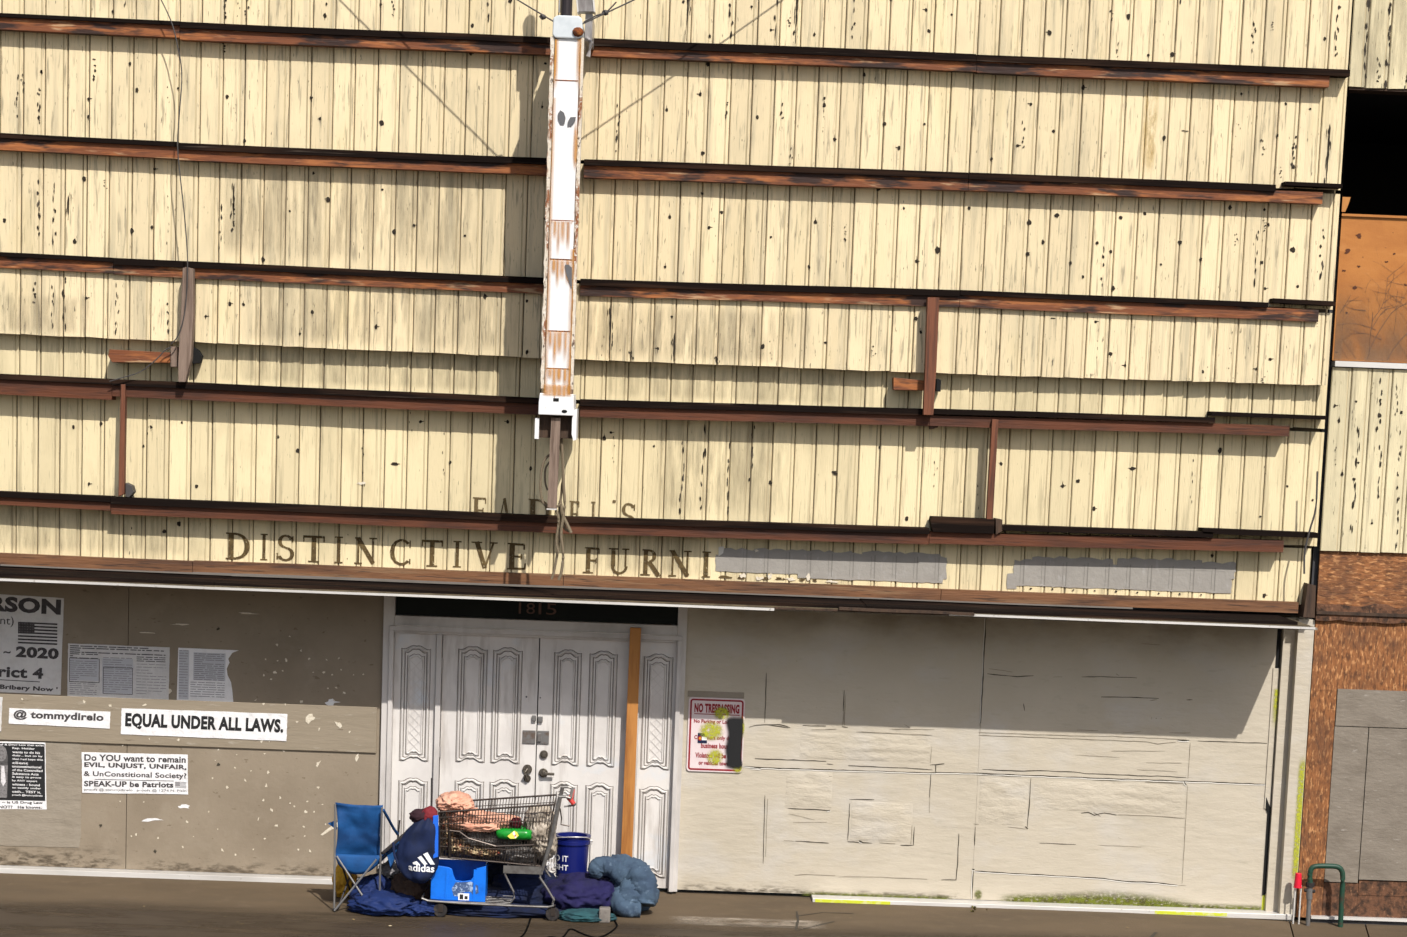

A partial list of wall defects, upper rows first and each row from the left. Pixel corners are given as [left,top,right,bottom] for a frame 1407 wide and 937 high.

corrosion [544,221,575,396]